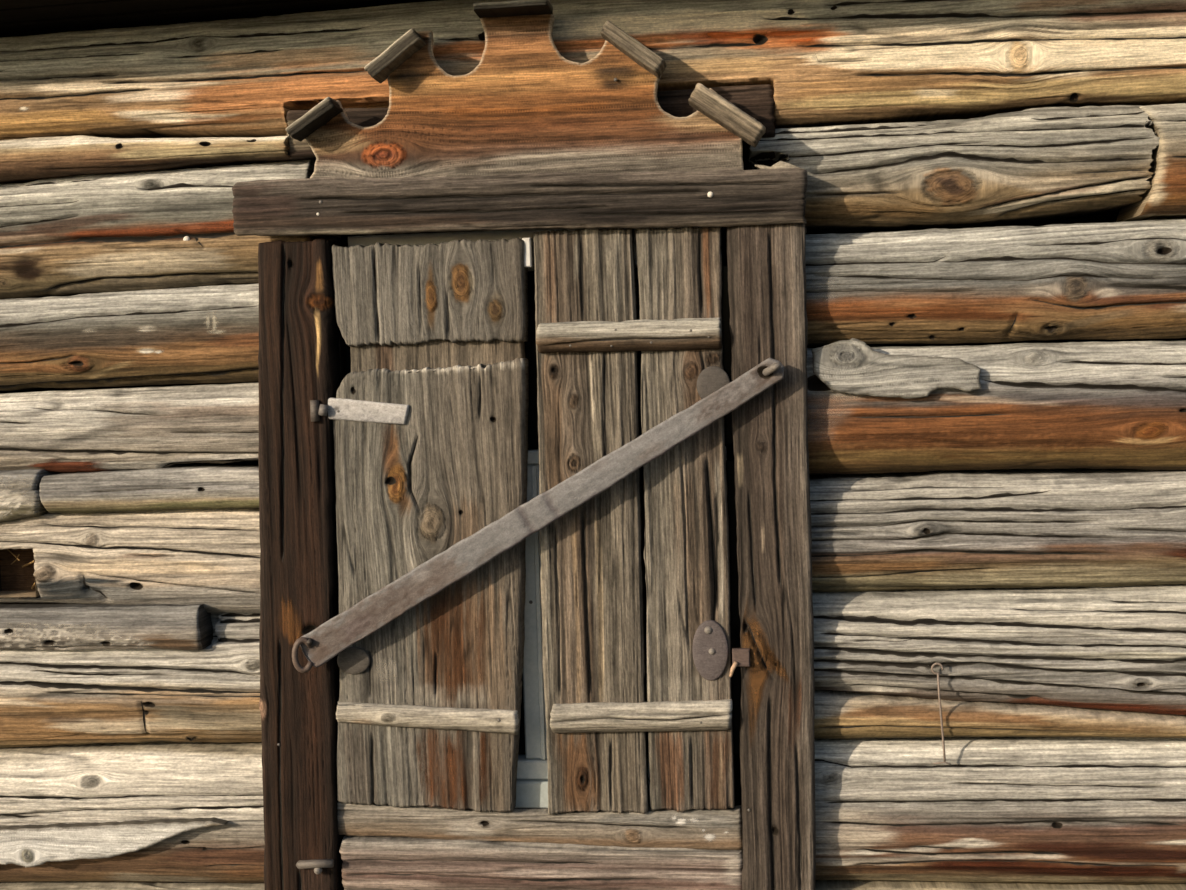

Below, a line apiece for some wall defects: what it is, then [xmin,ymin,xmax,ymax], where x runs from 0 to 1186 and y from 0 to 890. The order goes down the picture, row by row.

crack [297,111,1186,890]